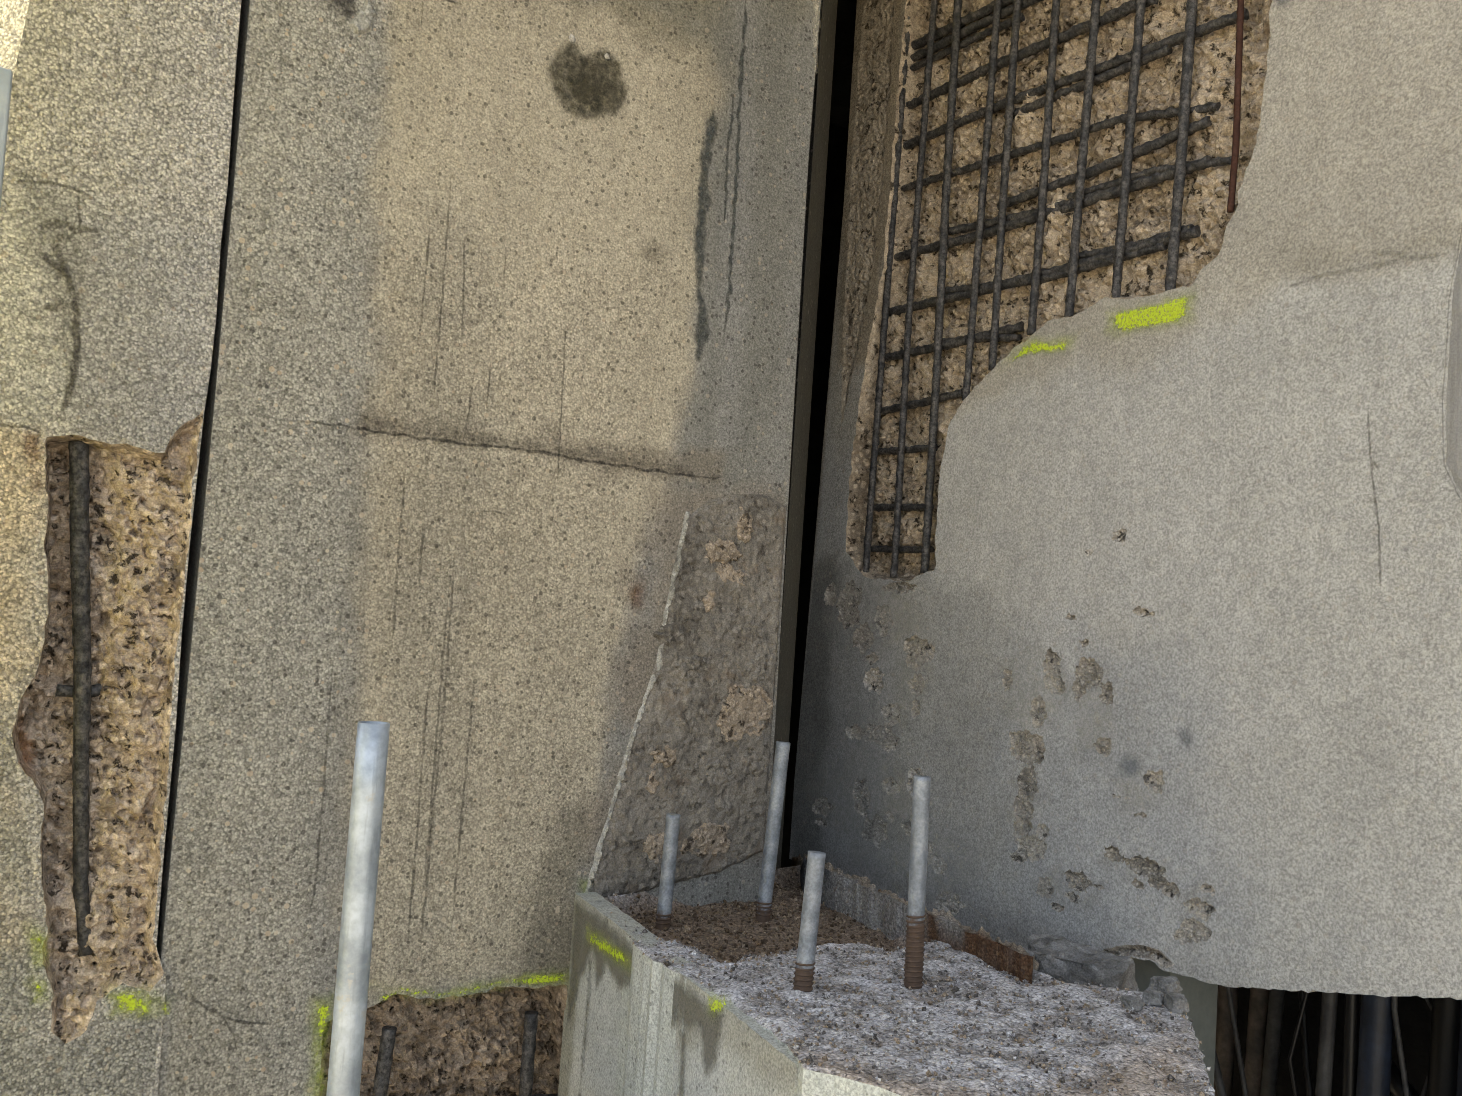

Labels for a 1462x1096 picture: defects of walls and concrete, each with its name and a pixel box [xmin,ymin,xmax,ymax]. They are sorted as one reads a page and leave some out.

water stain [551,33,625,117]
water stain [694,11,747,360]
crack [45,184,96,403]
spalling [824,0,1272,719]
spalling [12,409,204,1044]
spalling [852,767,924,818]
spalling [1009,638,1114,912]
spalling [1143,769,1165,794]
spalling [1103,845,1216,945]
spalling [1104,945,1175,968]
spalling [318,1019,333,1096]
spalling [360,985,567,1096]